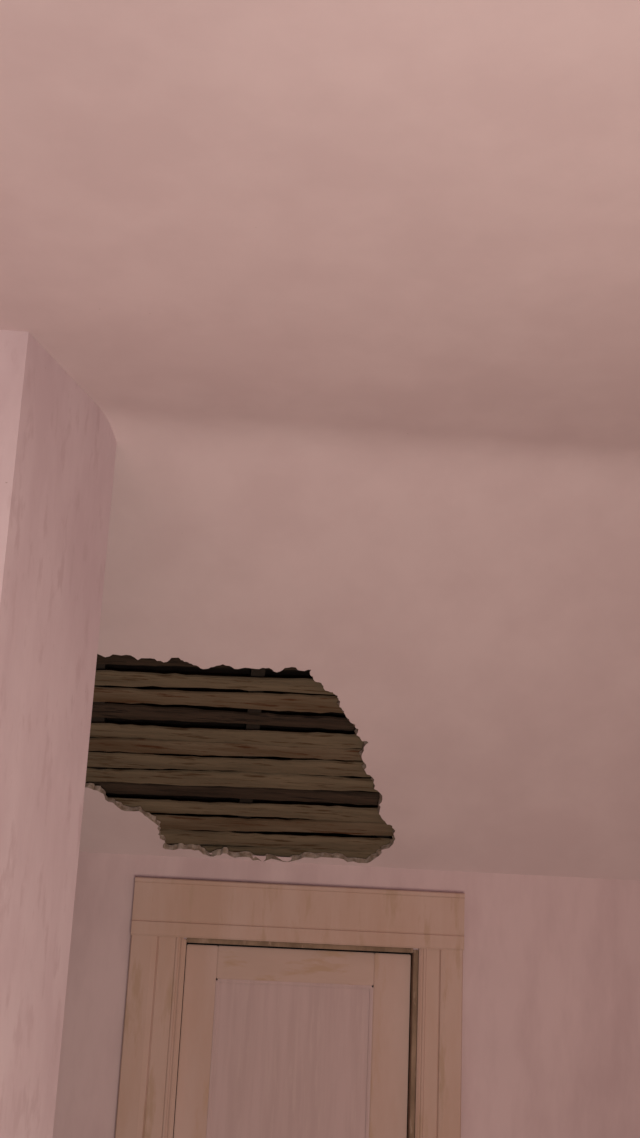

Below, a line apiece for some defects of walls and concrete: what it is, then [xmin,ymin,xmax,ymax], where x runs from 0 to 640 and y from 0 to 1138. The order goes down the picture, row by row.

flaking render [85,654,395,863]